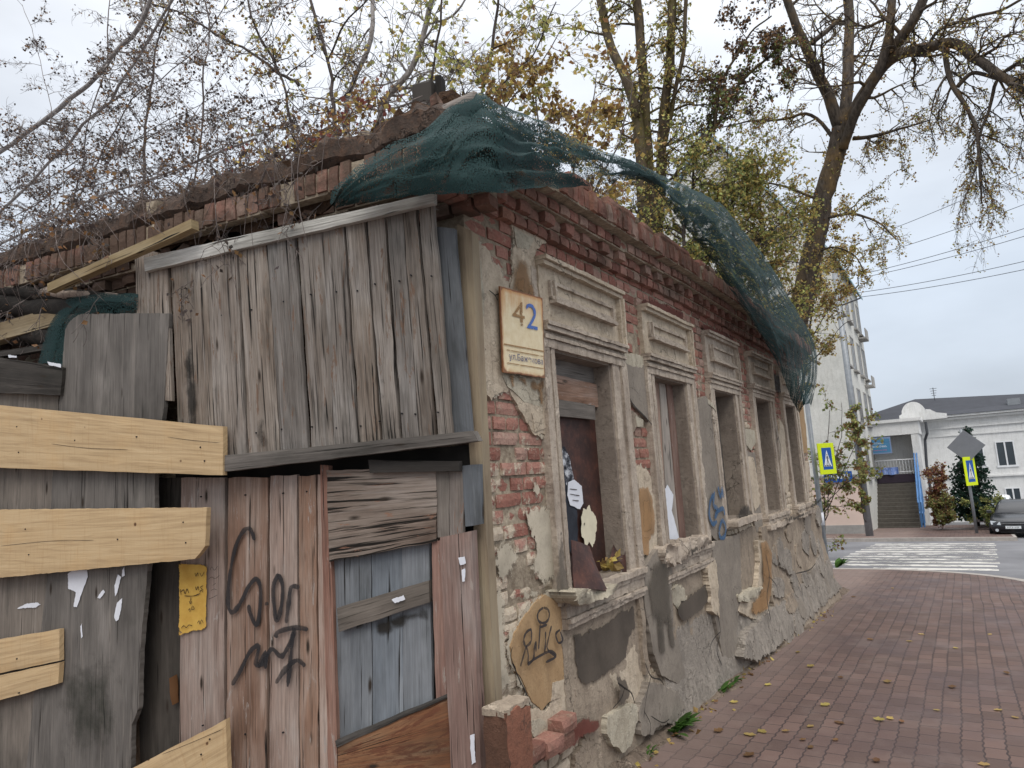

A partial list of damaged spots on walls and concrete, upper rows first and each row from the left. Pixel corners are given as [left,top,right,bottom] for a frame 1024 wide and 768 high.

flaking render [479,224,547,439]
flaking render [631,410,643,432]
peeling [496,540,518,691]
peeling [524,482,619,606]
flaking render [671,584,687,609]
flaking render [701,560,720,618]
flaking render [736,540,770,620]
flaking render [530,645,685,765]